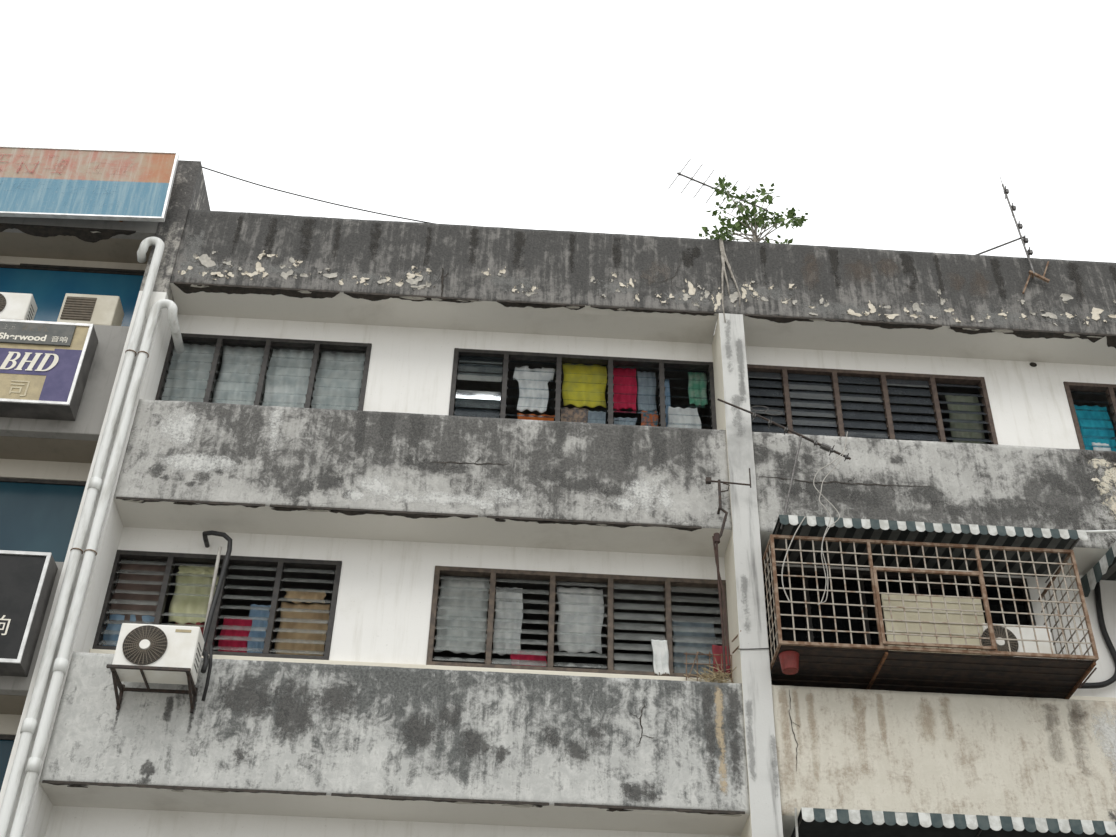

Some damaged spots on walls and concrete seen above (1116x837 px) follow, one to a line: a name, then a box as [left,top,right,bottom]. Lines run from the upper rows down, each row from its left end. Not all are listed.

spalling [497,273,1116,348]
water stain [149,414,233,486]
water stain [297,465,520,509]
water stain [541,421,673,510]
peeling [1074,450,1116,547]
water stain [137,760,155,784]
mould [219,673,357,740]
water stain [462,731,511,763]
water stain [621,782,661,802]
crack [630,705,655,747]
water stain [703,688,742,791]
crack [789,690,800,771]